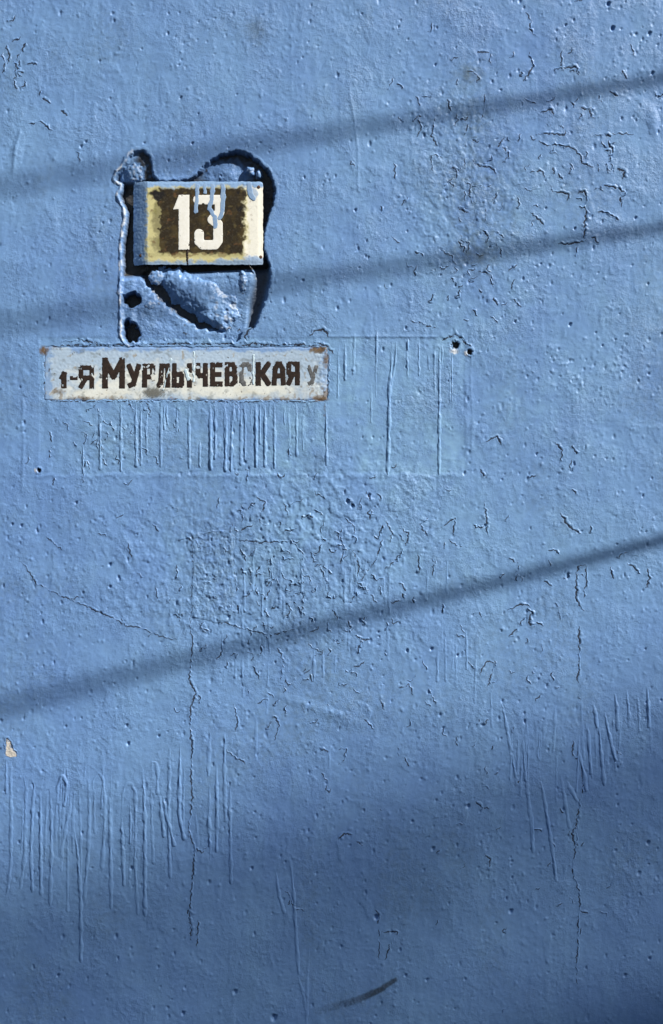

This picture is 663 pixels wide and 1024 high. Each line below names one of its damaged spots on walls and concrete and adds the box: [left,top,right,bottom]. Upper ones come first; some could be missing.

peeling [518,52,536,82]
peeling [554,46,580,75]
peeling [398,90,634,324]
peeling [154,473,429,741]
peeling [416,516,463,576]
peeling [4,736,18,757]
crack [19,557,207,946]
crack [569,740,588,991]